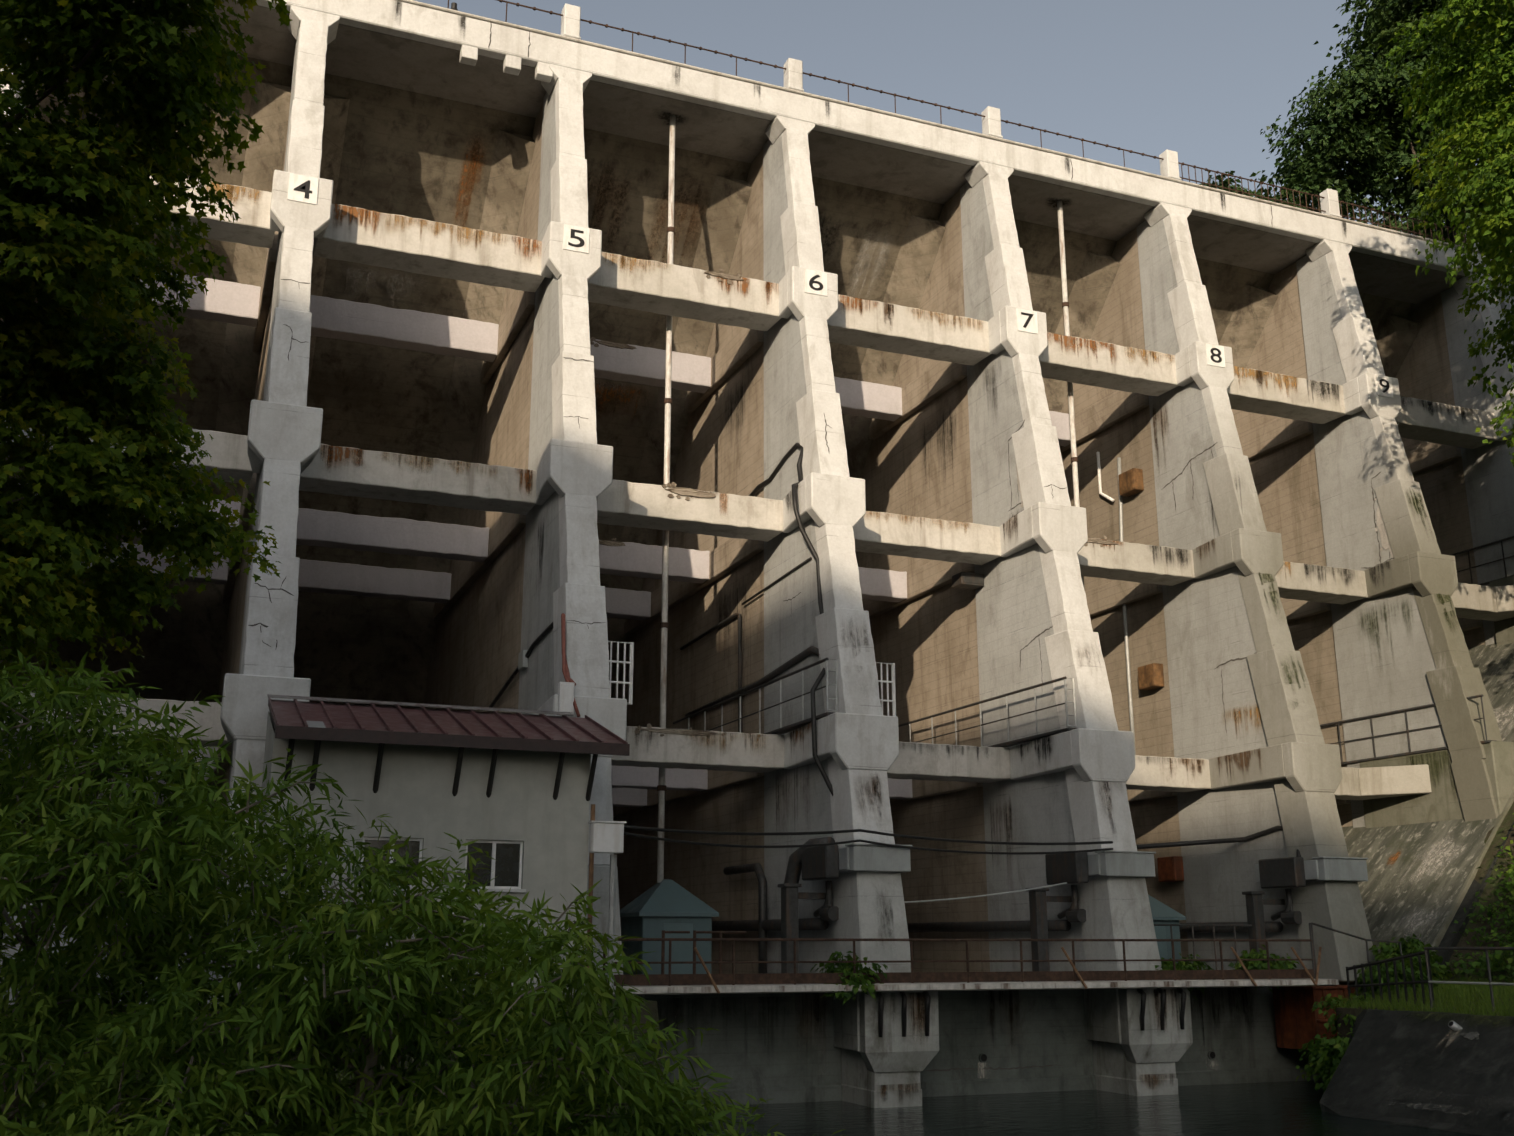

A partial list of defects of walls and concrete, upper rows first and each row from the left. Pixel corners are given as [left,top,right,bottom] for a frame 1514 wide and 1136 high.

rust [334,149,540,257]
rust [716,276,777,300]
rust [840,295,894,322]
rust [1047,332,1171,360]
rust [1234,366,1297,390]
rust [323,445,362,465]
rust [520,469,532,493]
crack [1161,443,1216,510]
crack [249,577,294,648]
rust [1228,707,1261,726]